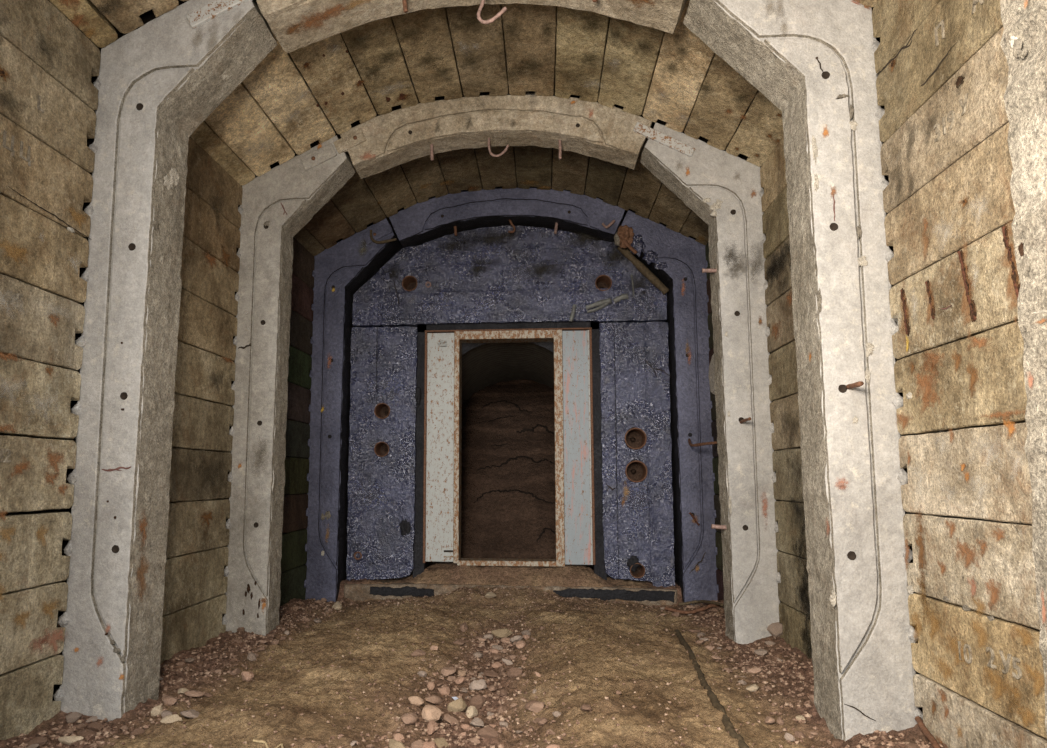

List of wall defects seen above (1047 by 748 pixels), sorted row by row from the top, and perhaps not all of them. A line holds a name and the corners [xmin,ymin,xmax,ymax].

corrosion [952,354,978,392]